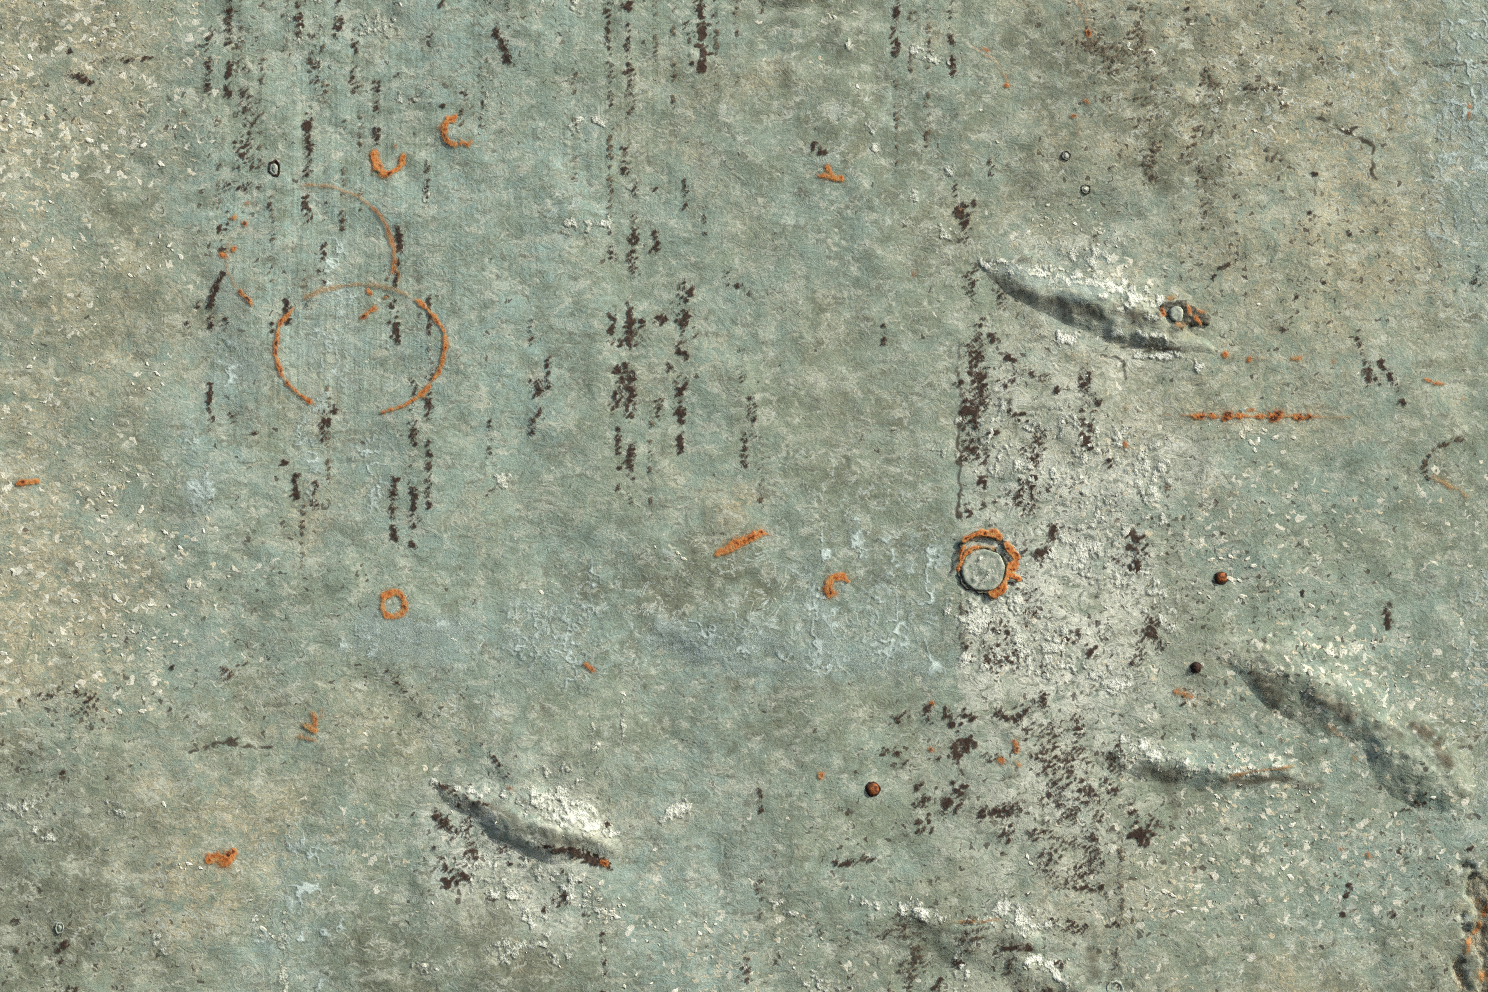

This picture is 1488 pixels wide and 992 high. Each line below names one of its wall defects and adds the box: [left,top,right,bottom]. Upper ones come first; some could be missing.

leakage [182,0,267,455]
leakage [269,0,381,568]
corrosion [370,145,406,178]
corrosion [381,299,449,413]
leakage [607,278,708,516]
leakage [603,0,741,275]
leakage [954,263,1060,563]
corrosion [1183,408,1312,422]
corrosion [380,589,408,619]
corrosion [715,529,767,557]
corrosion [956,528,1022,599]
leakage [889,581,1160,929]